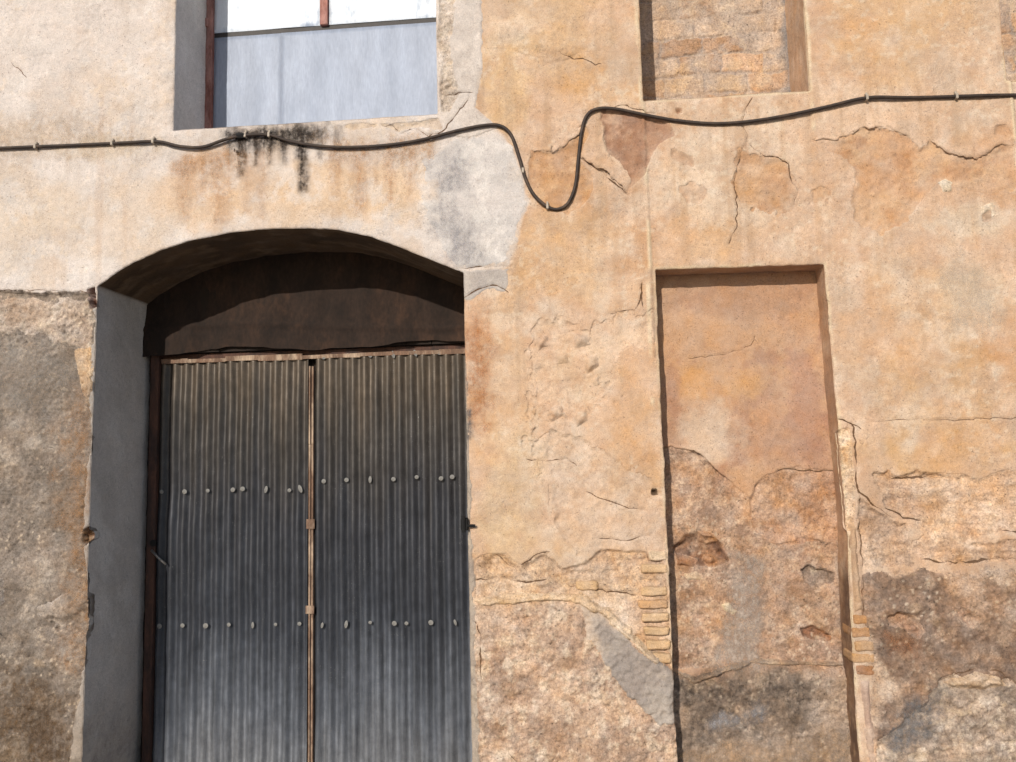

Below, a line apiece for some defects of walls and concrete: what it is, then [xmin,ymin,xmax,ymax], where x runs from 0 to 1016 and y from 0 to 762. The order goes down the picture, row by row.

leakage [225,126,323,190]
spalling [528,110,694,215]
spalling [679,182,707,204]
crack [729,97,753,243]
spalling [730,135,831,218]
flaking render [812,120,1016,236]
flaking render [0,290,97,762]
flaking render [475,309,1016,675]
flaking render [876,673,1016,762]